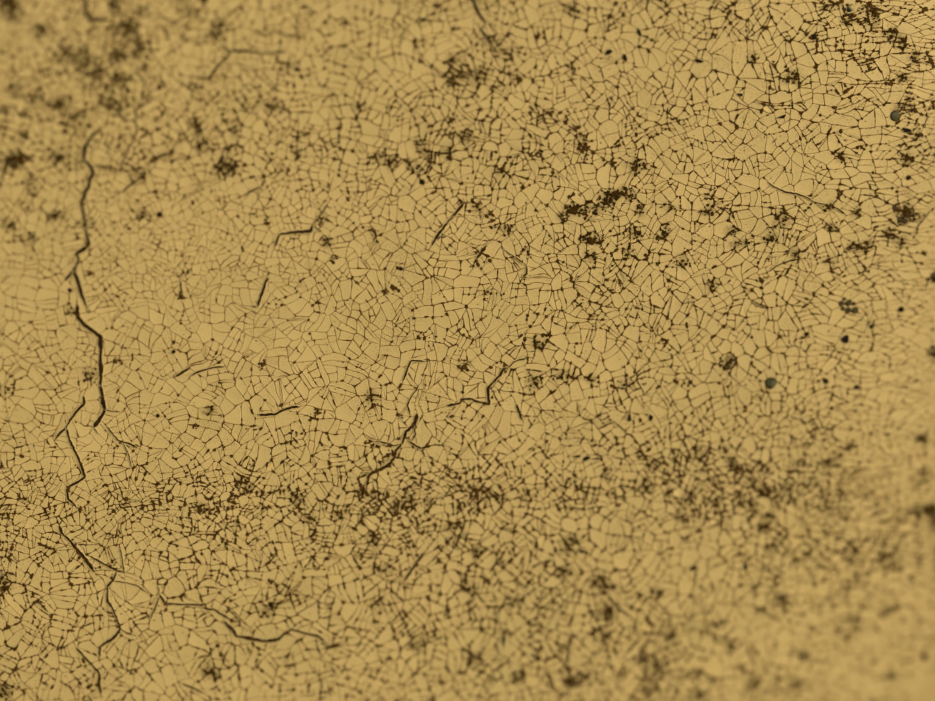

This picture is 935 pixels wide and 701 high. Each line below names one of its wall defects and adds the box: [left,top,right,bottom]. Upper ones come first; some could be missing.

crack [83,0,110,55]
crack [246,185,262,195]
crack [274,205,332,247]
crack [55,68,156,508]
crack [177,280,185,297]
crack [250,276,269,308]
crack [174,365,224,378]
crack [447,357,527,408]
crack [258,405,300,417]
crack [363,359,432,487]
crack [515,404,524,421]
crack [58,525,342,701]